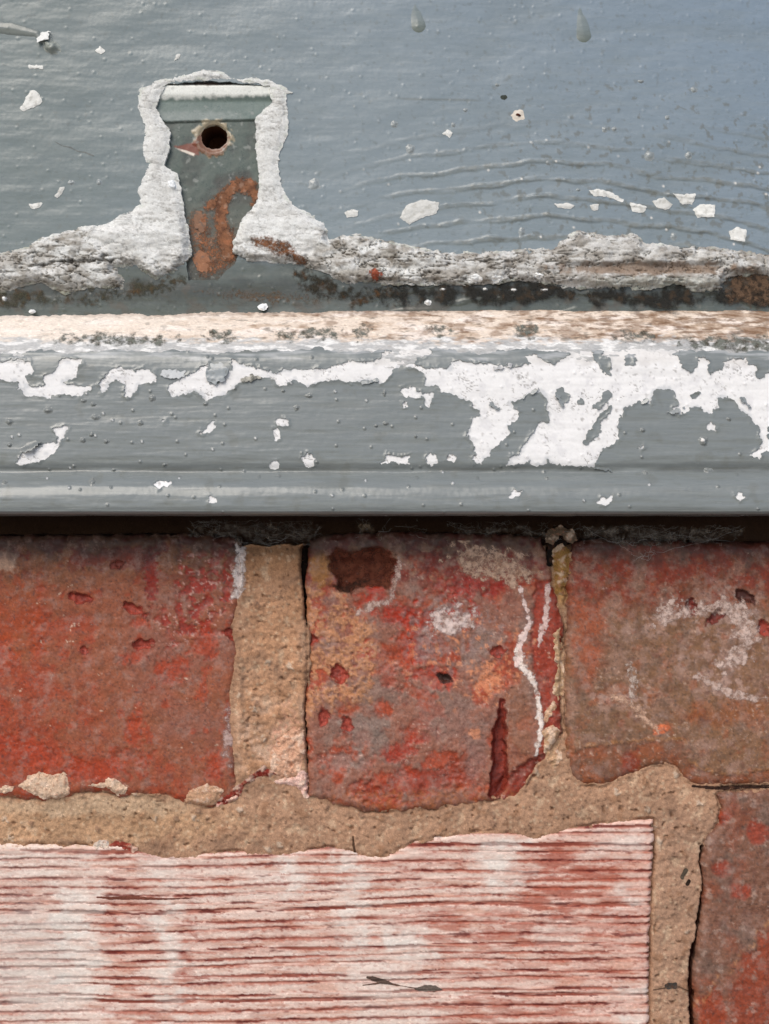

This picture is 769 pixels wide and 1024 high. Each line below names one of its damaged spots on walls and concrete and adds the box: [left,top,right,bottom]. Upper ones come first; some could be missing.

corrosion [188,177,258,277]
peeling [400,200,439,224]
peeling [589,189,715,218]
peeling [729,227,747,242]
leakage [370,274,769,312]
peeling [0,348,769,472]
crack [301,545,309,625]
leakage [439,540,551,756]
spalling [488,698,509,800]
crack [653,845,701,1024]